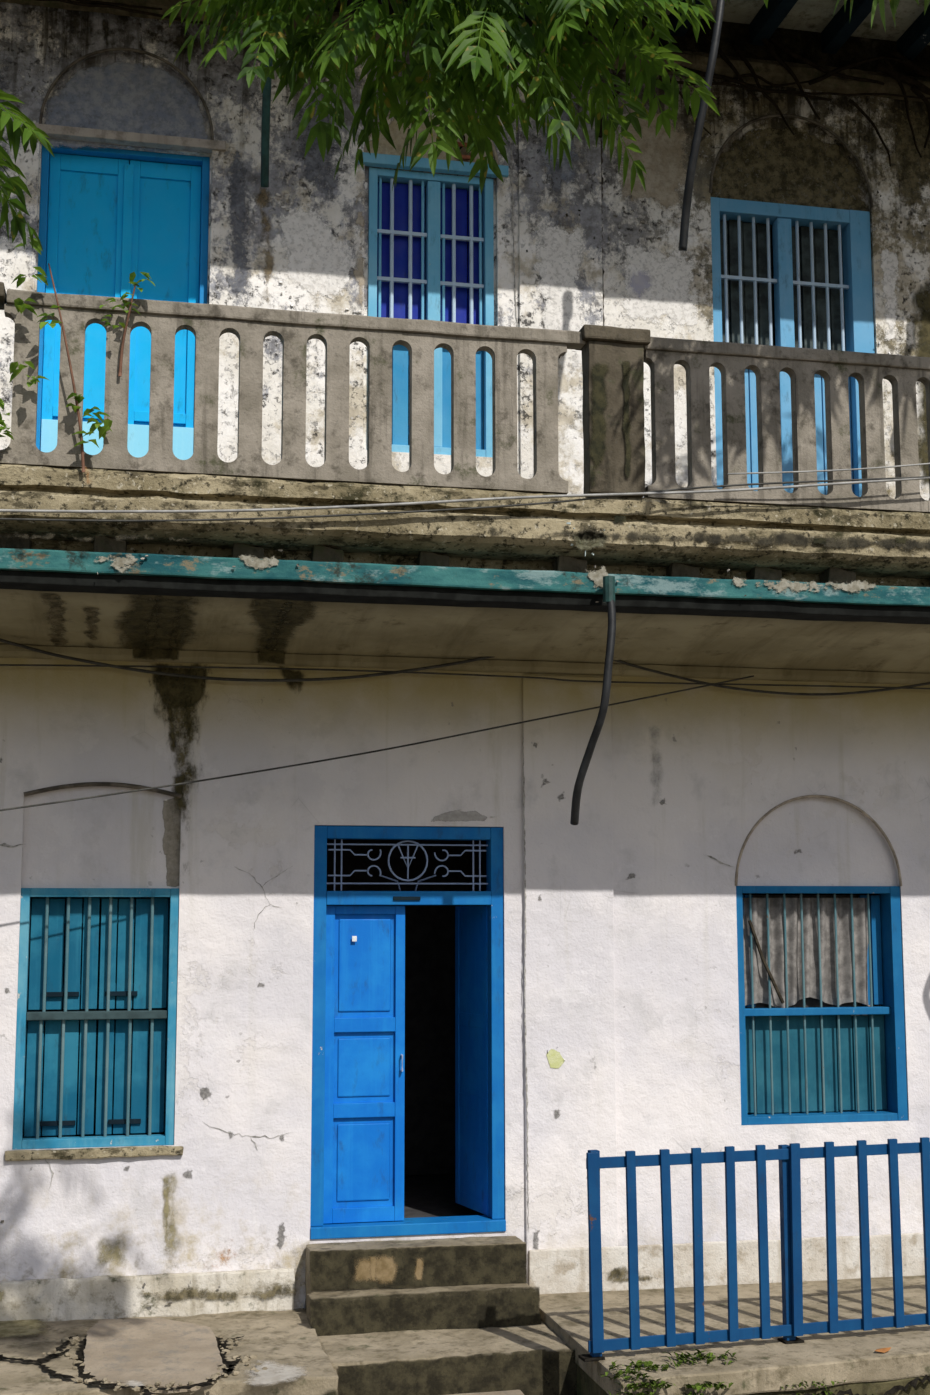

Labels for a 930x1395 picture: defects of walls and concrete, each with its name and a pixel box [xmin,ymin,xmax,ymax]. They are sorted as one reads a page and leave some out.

damp [45,20,210,149]
damp [710,125,881,211]
damp [889,107,930,224]
damp [212,151,290,297]
damp [910,283,930,357]
damp [918,383,929,484]
peeling [93,554,148,574]
peeling [232,549,283,570]
spalling [566,516,626,603]
damp [540,528,930,550]
damp [250,599,315,689]
damp [116,595,207,819]